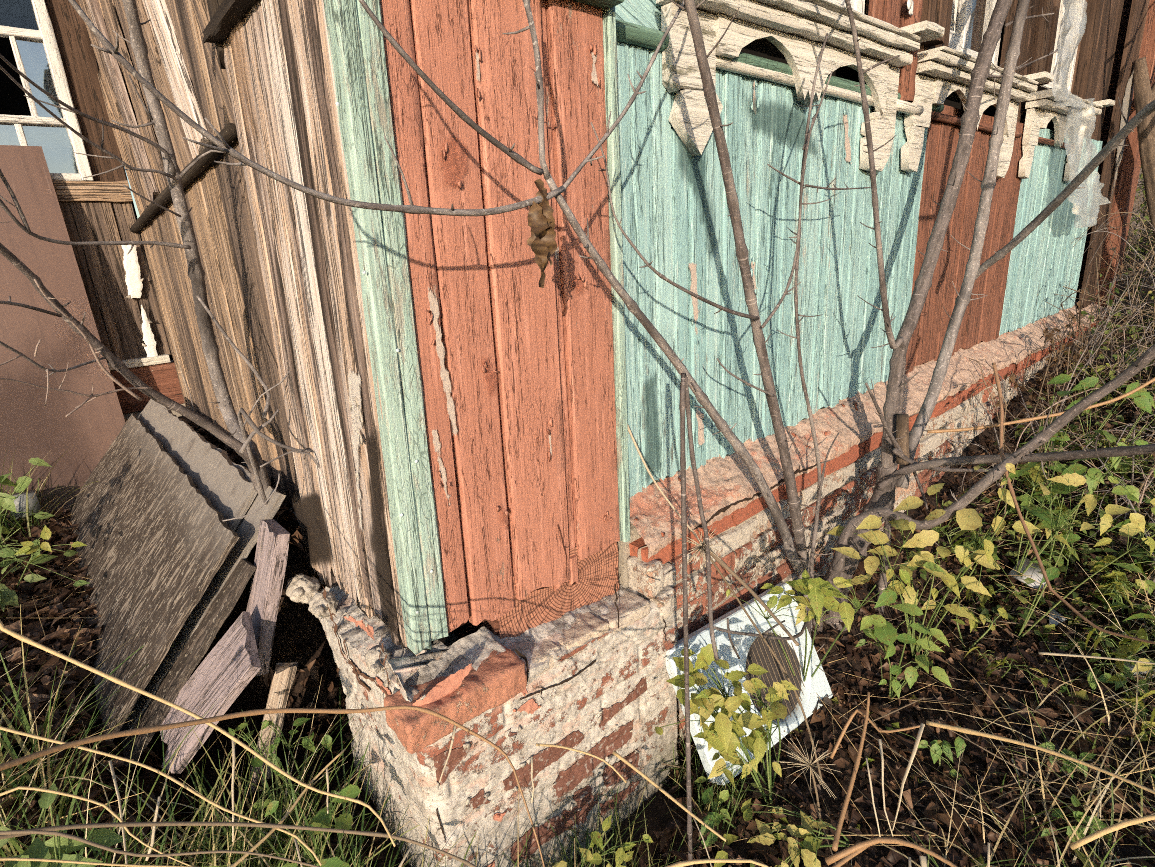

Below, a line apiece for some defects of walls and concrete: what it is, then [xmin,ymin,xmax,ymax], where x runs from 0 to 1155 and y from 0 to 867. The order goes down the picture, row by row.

peeling [428,287,458,436]
peeling [432,429,451,505]
flaking render [912,438,952,498]
flaking render [669,466,877,641]
spalling [342,612,374,640]
spalling [413,664,472,706]
flaking render [677,719,691,750]
spalling [433,742,472,788]
spalling [503,677,647,865]
spalling [466,789,507,822]